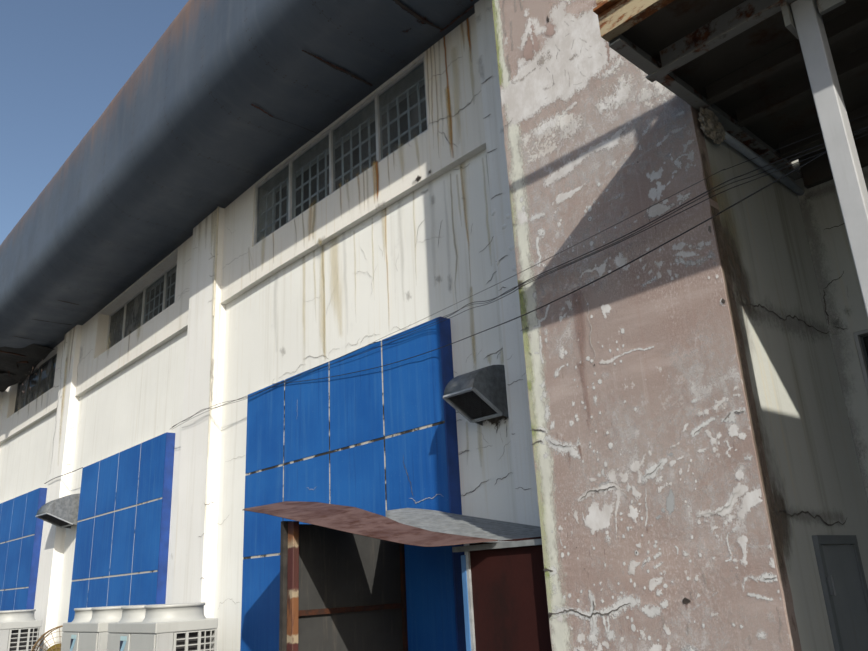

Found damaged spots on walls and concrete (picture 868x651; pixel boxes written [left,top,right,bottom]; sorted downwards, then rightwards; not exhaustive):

rust [393,0,474,146]
crack [427,77,513,147]
peeling [493,0,781,651]
crack [741,270,849,334]
damp [518,280,536,458]
crack [403,424,528,503]
crack [771,509,847,526]
crack [549,601,631,632]